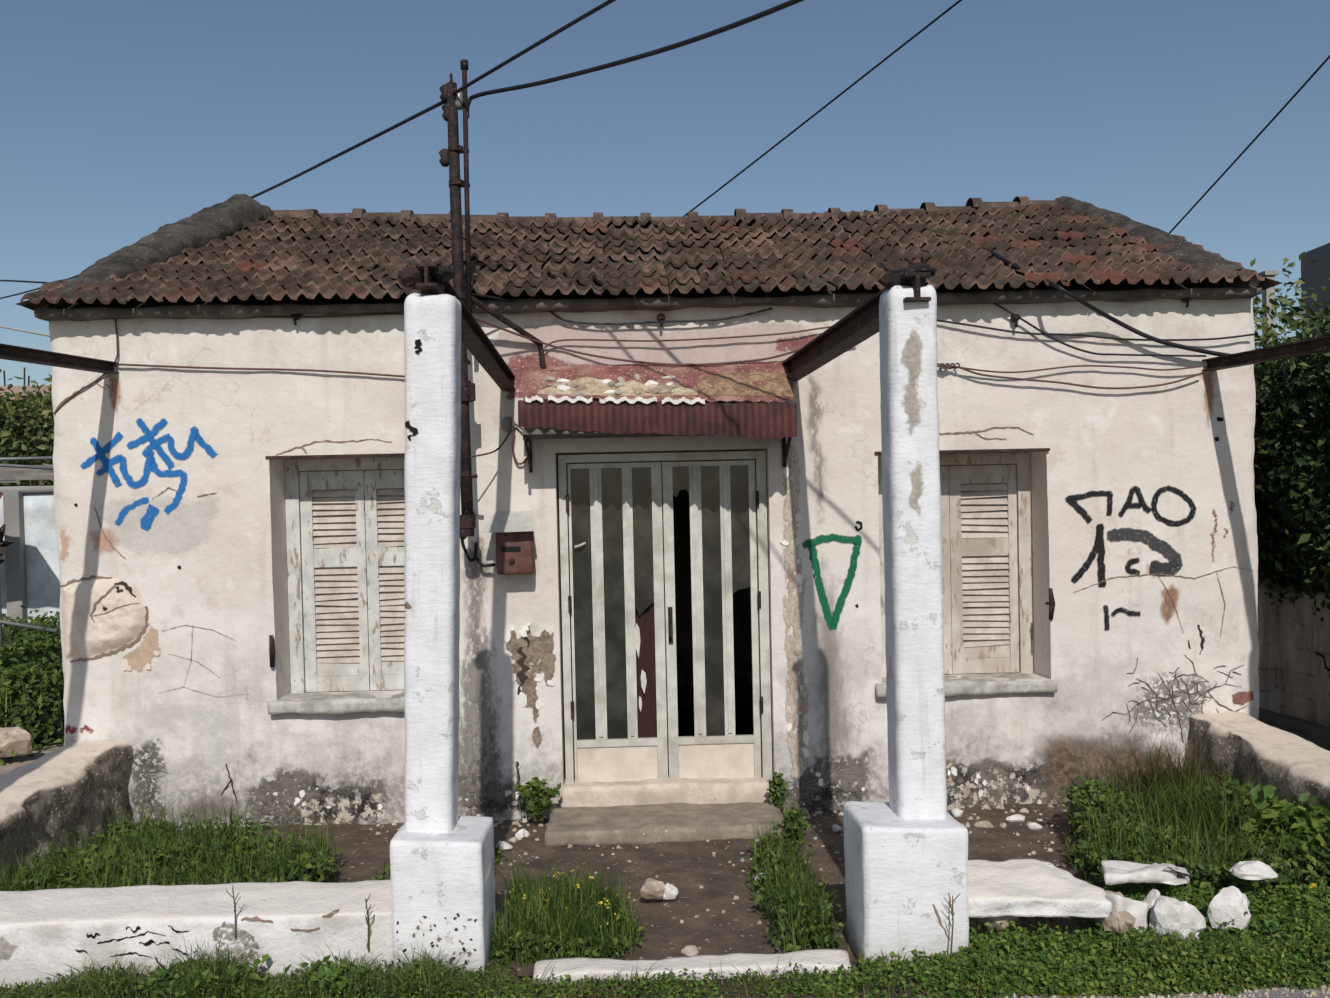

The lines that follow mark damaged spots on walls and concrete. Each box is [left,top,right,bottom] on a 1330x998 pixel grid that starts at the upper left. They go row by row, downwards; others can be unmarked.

peeling [496,322,817,405]
peeling [901,331,922,433]
crack [276,439,388,455]
crack [939,427,1034,440]
peeling [781,447,810,779]
rust [1162,587,1178,621]
crack [160,625,249,697]
damp [458,540,527,819]
spalling [504,622,556,748]
crack [1314,651,1330,678]
damp [131,743,167,819]
damp [193,769,392,826]